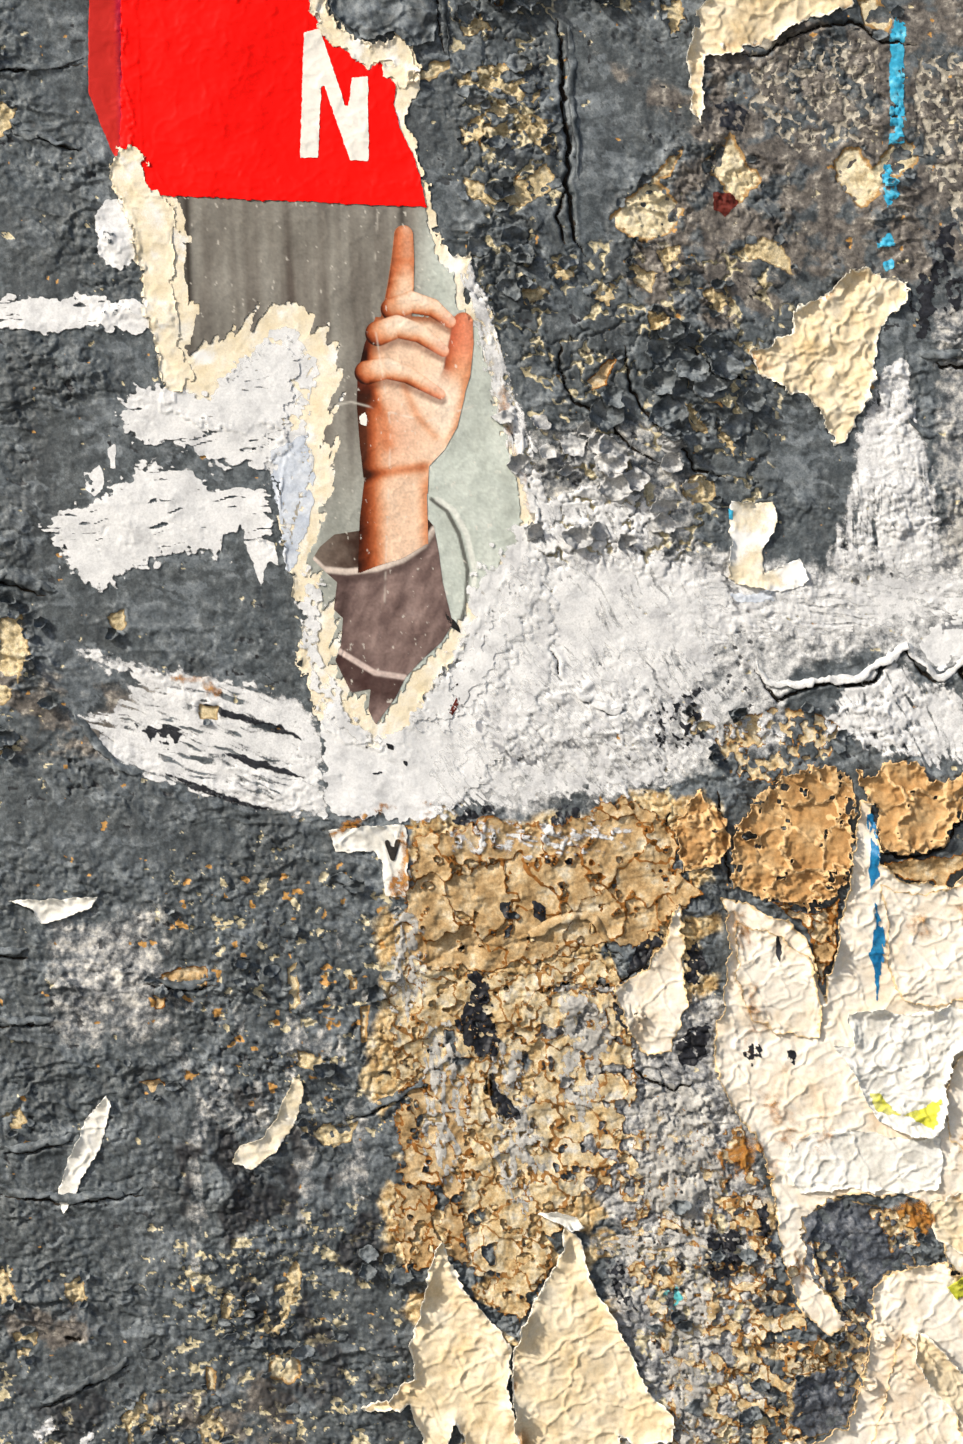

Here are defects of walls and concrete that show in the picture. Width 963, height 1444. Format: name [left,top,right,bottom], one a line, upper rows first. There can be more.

crack [436,0,444,51]
crack [555,18,586,257]
spalling [748,0,963,234]
peeling [330,0,766,533]
spalling [732,234,799,275]
peeling [524,522,543,541]
peeling [561,522,637,550]
peeling [278,922,299,939]
peeling [231,957,301,1014]
spalling [296,1050,335,1078]
peeling [348,702,963,1444]
spalling [294,1118,358,1152]